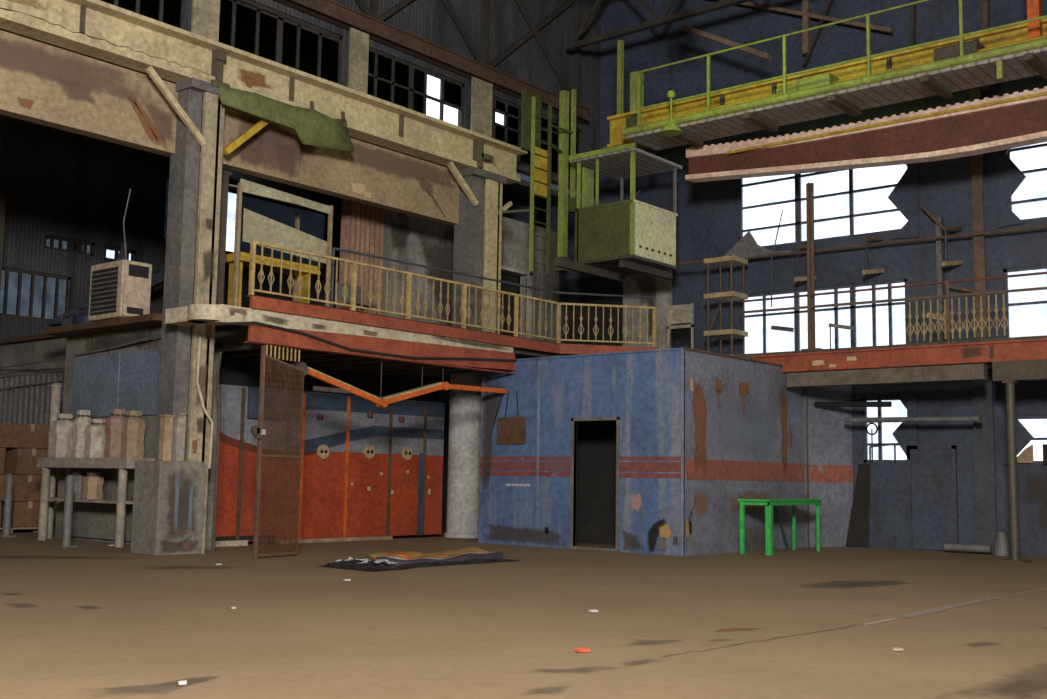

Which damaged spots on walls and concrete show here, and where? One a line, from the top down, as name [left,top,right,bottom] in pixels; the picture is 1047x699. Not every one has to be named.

corrosion [128,96,166,143]
spalling [648,519,692,551]